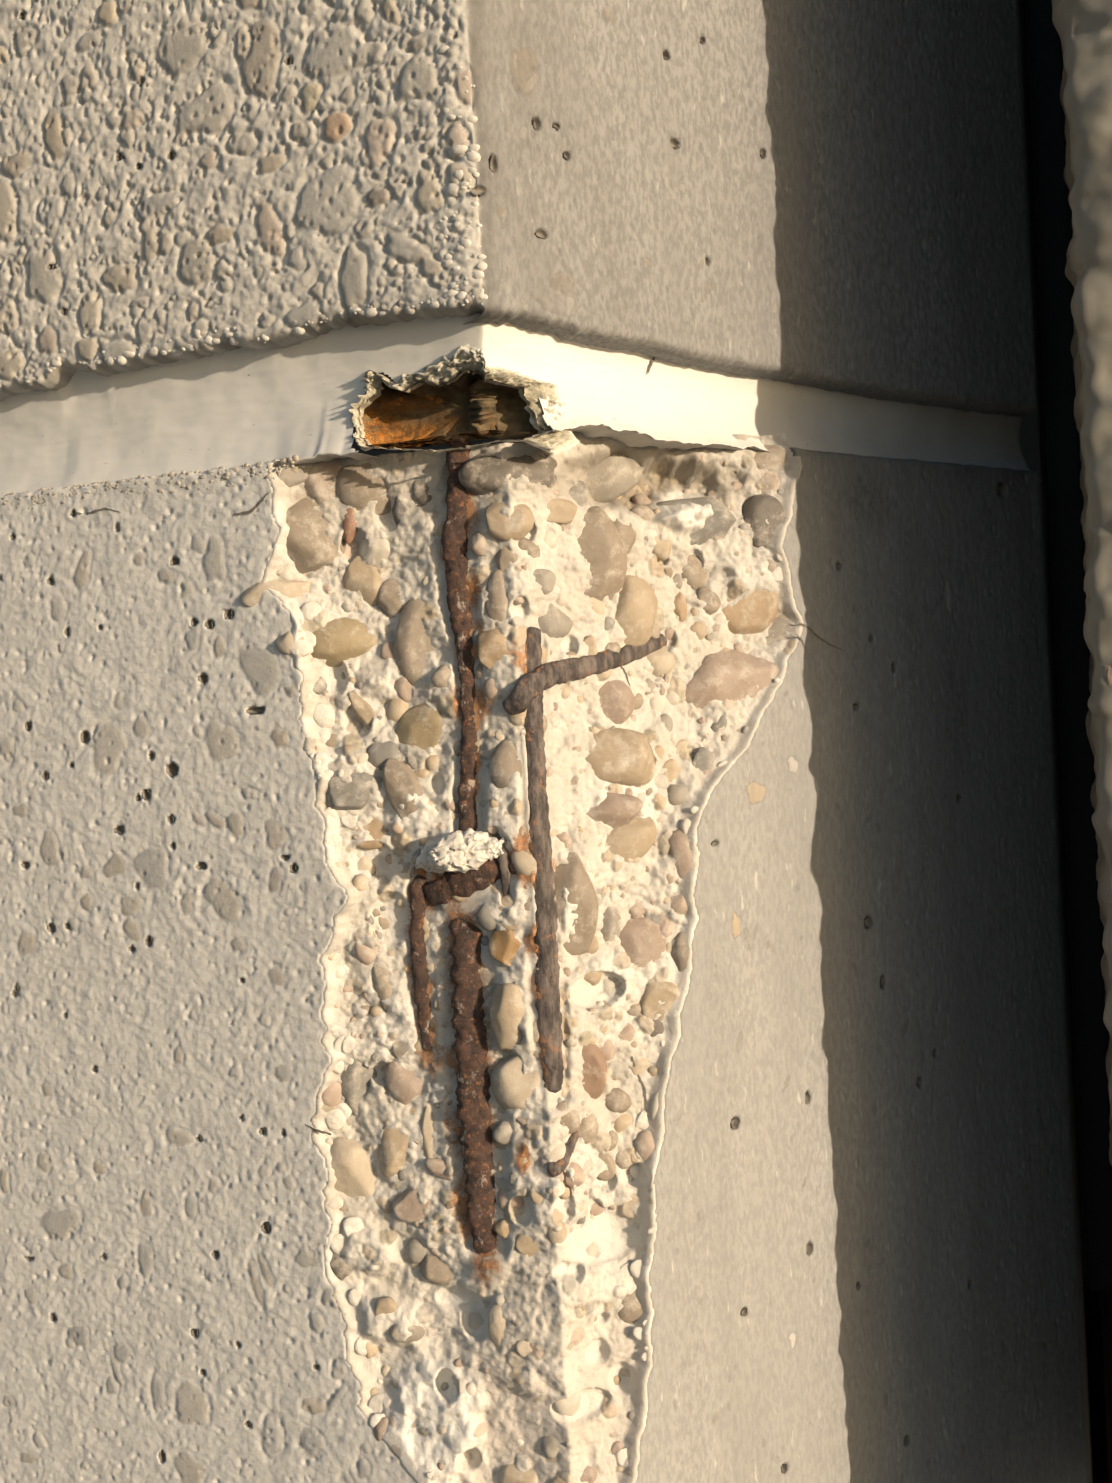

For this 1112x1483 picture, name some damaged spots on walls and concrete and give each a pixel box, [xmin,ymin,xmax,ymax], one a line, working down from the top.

corrosion [354,397,502,450]
corrosion [456,574,483,661]
corrosion [453,689,488,732]
corrosion [509,832,555,883]
spalling [1,431,804,1483]
corrosion [407,868,474,1012]
corrosion [525,925,538,953]
corrosion [450,1114,472,1236]
corrosion [518,1144,530,1172]
corrosion [474,1248,499,1282]